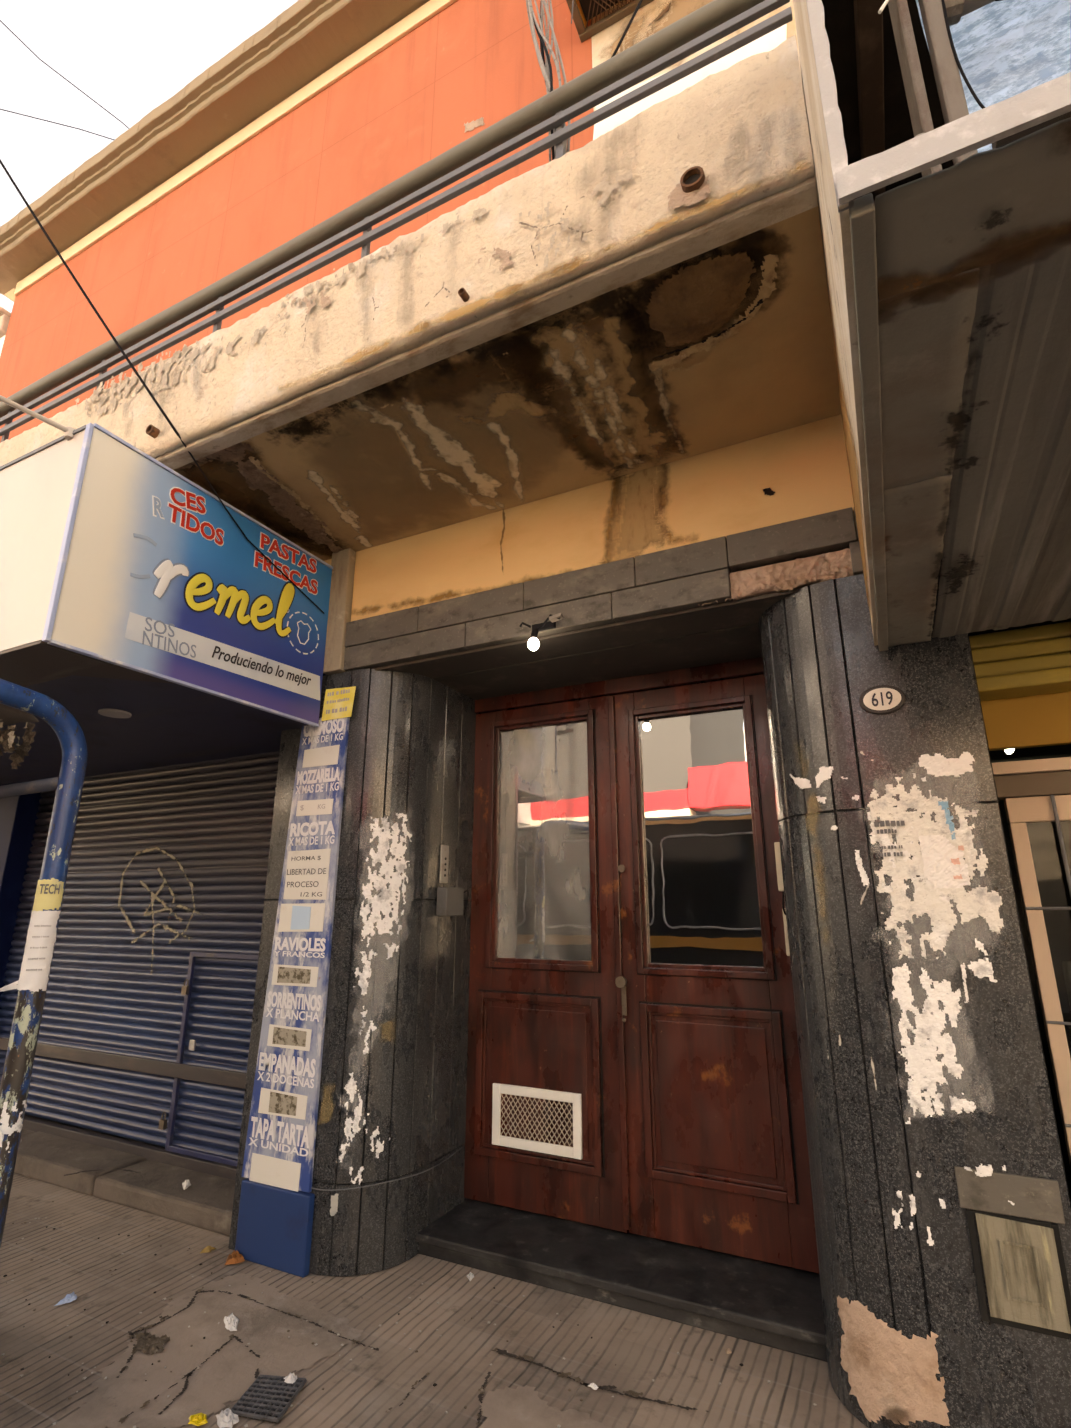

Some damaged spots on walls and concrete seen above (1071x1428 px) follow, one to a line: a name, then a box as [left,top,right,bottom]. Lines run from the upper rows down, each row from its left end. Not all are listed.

water stain [644,182,762,234]
rust [914,236,1071,304]
water stain [267,230,787,564]
water stain [937,313,1007,536]
water stain [180,449,373,556]
crack [498,511,506,570]
water stain [928,553,978,636]